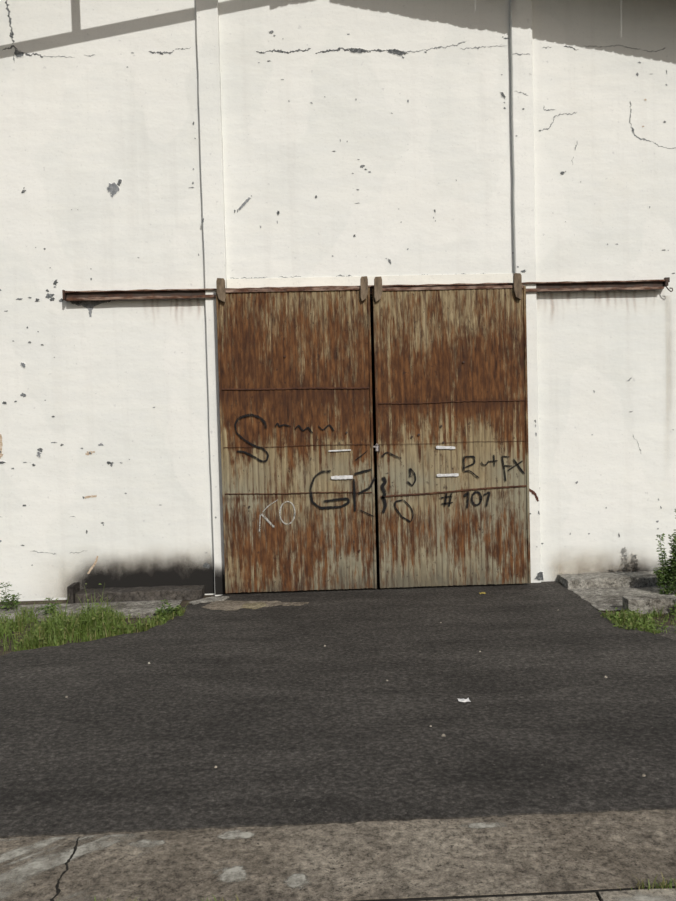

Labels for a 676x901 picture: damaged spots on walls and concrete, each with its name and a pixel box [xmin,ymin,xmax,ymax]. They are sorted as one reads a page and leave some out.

crack [3,0,94,61]
crack [256,42,665,58]
crack [519,92,577,131]
crack [629,102,676,149]
peeling [106,178,123,198]